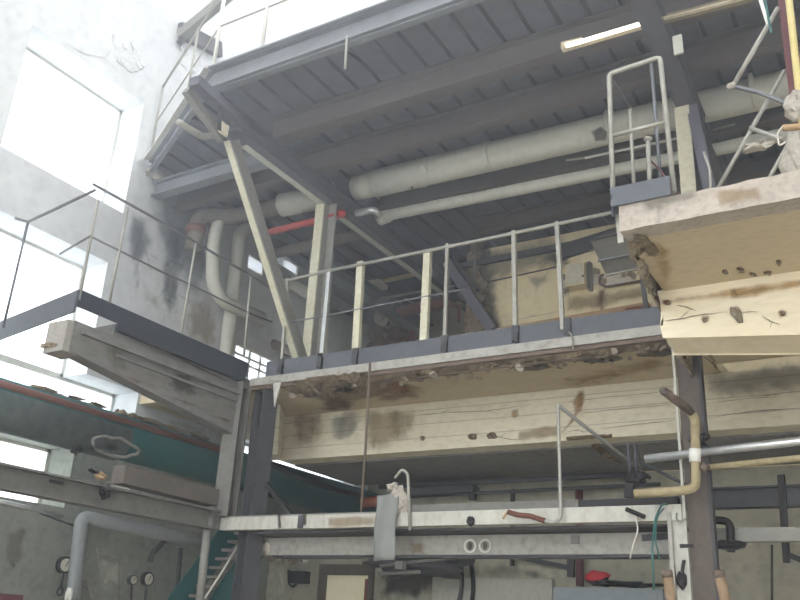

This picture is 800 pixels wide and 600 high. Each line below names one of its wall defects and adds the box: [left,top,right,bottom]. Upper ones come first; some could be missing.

leakage [131,219,148,258]
leakage [161,197,203,305]
spalling [593,234,670,312]
crack [659,305,721,322]
spalling [285,341,693,399]
corrosion [569,392,583,425]